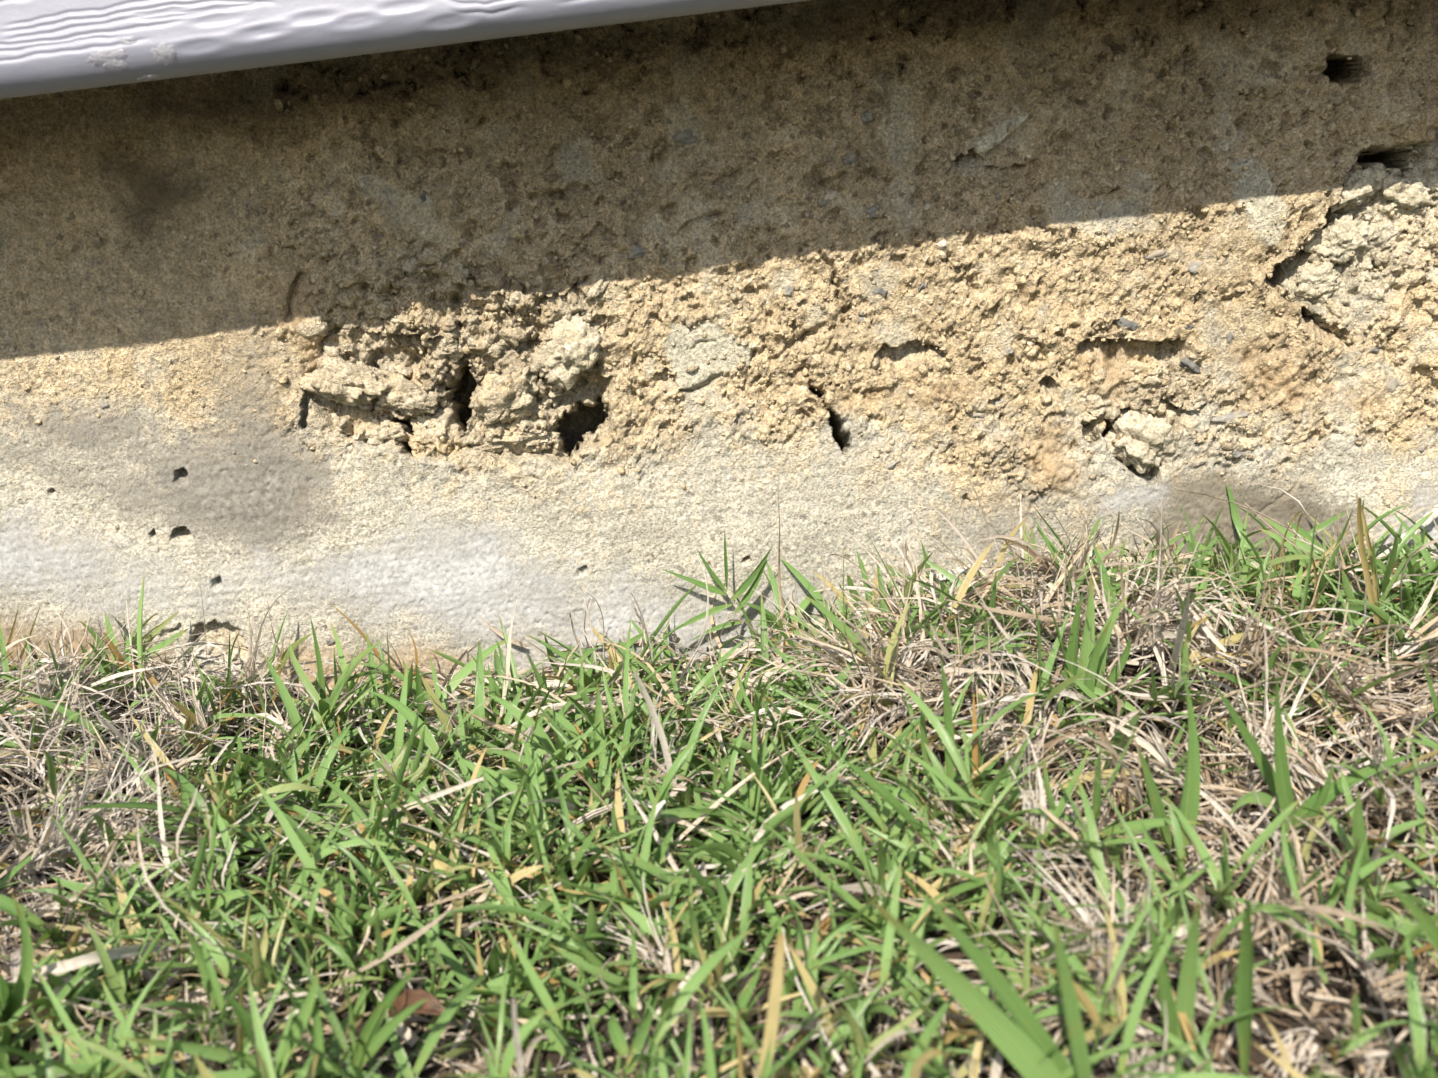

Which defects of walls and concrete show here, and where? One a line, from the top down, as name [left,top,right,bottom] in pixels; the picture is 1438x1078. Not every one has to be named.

spalling [1227,128,1438,346]
spalling [279,213,639,469]
crack [767,249,850,415]
water stain [0,516,170,610]
water stain [118,443,316,540]
water stain [249,526,818,661]